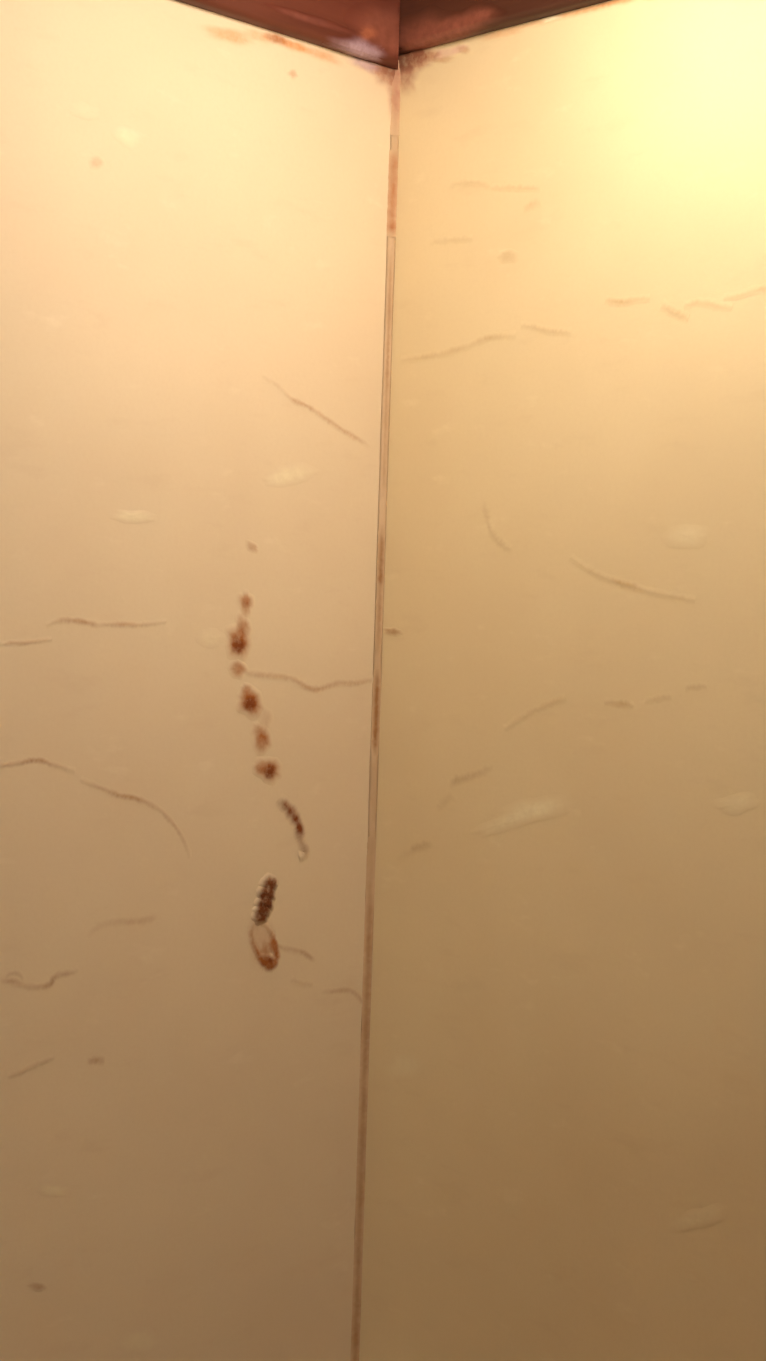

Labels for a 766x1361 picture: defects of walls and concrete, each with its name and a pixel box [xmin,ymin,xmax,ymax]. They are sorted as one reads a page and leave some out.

crack [244,247,572,756]
crack [1,615,167,648]
rust [224,589,311,864]
crack [0,756,192,859]
rust [245,873,317,973]
crack [0,965,78,991]
crack [350,837,376,1361]